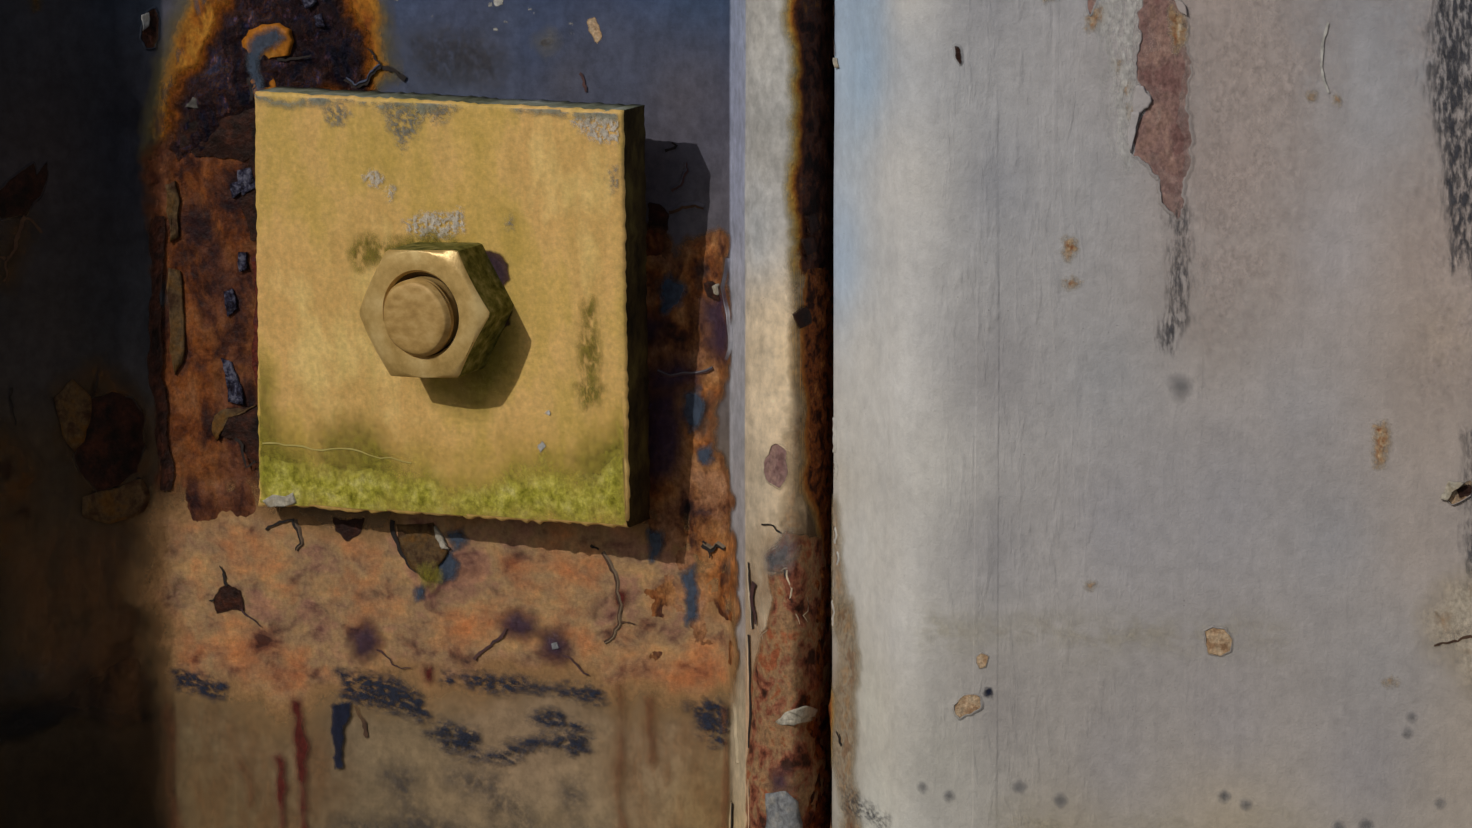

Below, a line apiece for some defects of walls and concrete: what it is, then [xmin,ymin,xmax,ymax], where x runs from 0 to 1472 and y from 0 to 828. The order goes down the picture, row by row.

peeling [1127,0,1197,223]
corrosion [139,0,860,828]
peeling [1440,479,1472,506]